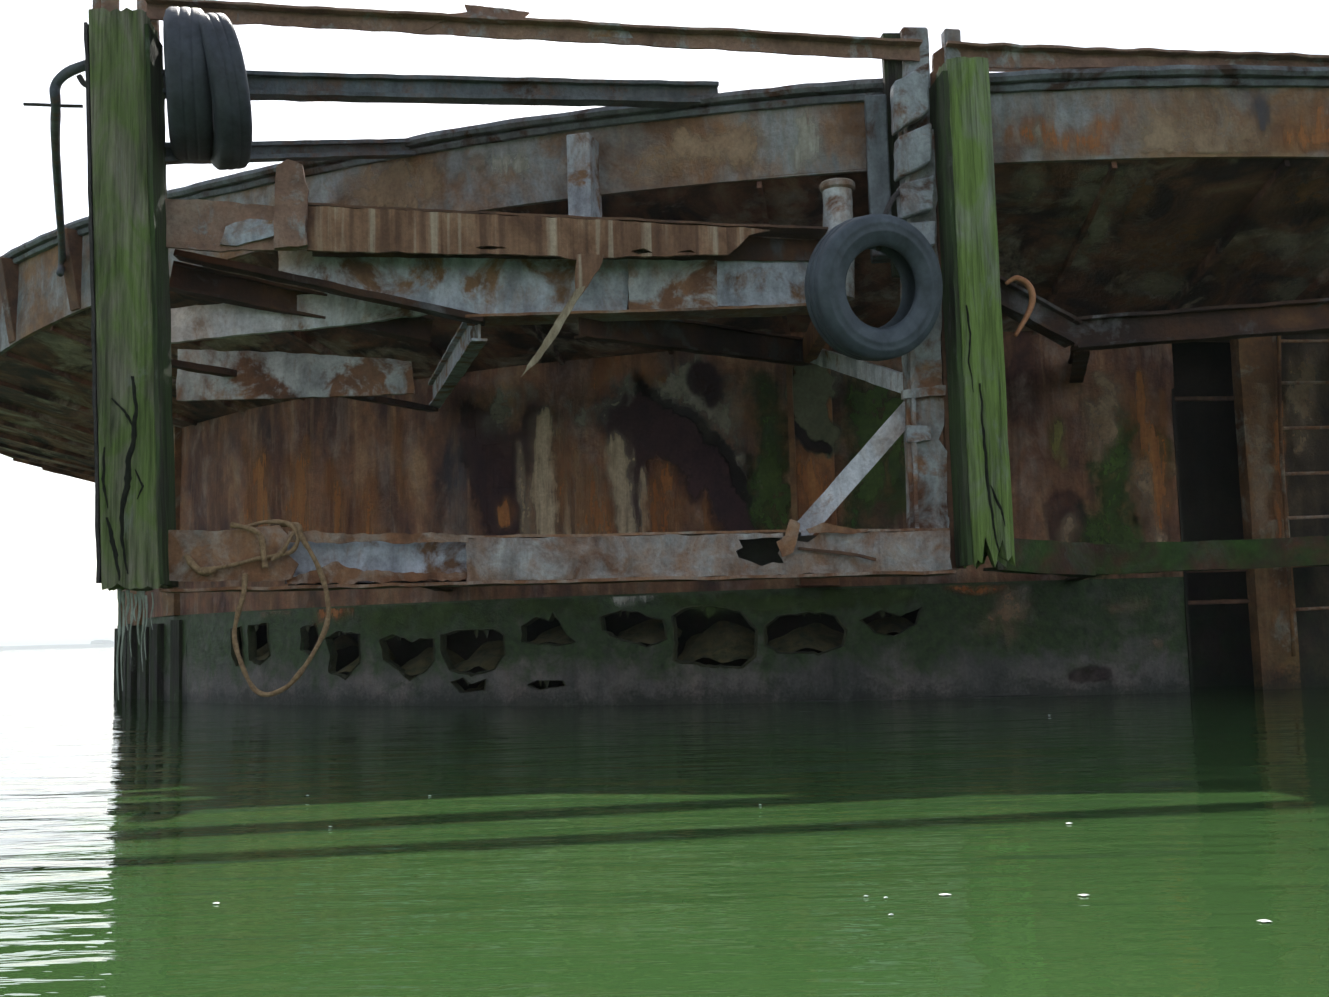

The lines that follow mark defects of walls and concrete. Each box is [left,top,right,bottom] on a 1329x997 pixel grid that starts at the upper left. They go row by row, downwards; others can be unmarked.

rust [1141,87,1270,154]
crack [101,376,144,581]
rust [460,401,547,536]
rust [598,380,761,533]
water stain [743,371,791,530]
rust [796,452,832,510]
crack [966,305,1005,552]